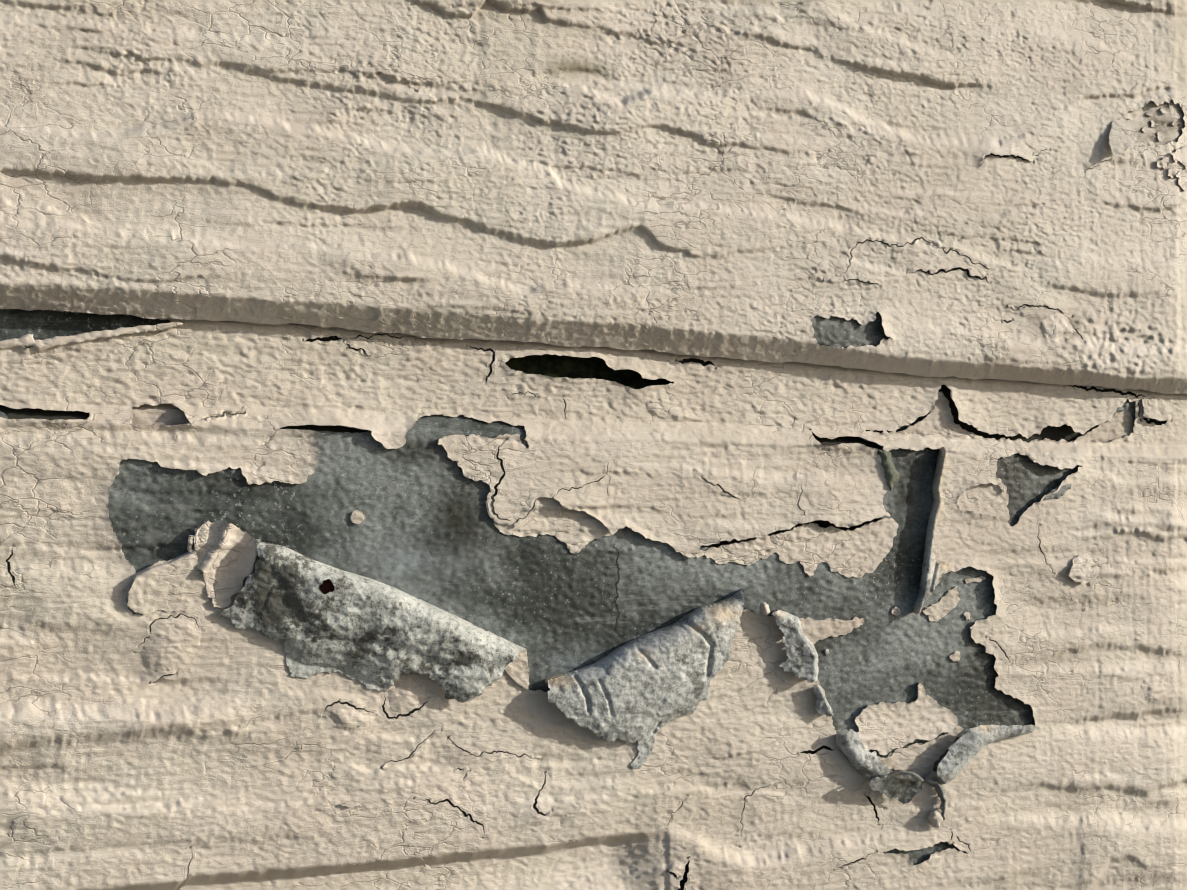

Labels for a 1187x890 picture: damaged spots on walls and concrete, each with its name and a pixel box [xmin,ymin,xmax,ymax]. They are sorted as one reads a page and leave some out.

spalling [1084,99,1187,191]
crack [822,234,1086,343]
peeling [0,309,183,352]
peeling [811,312,890,348]
peeling [108,385,1174,866]
crack [834,792,882,873]
crack [666,857,693,890]